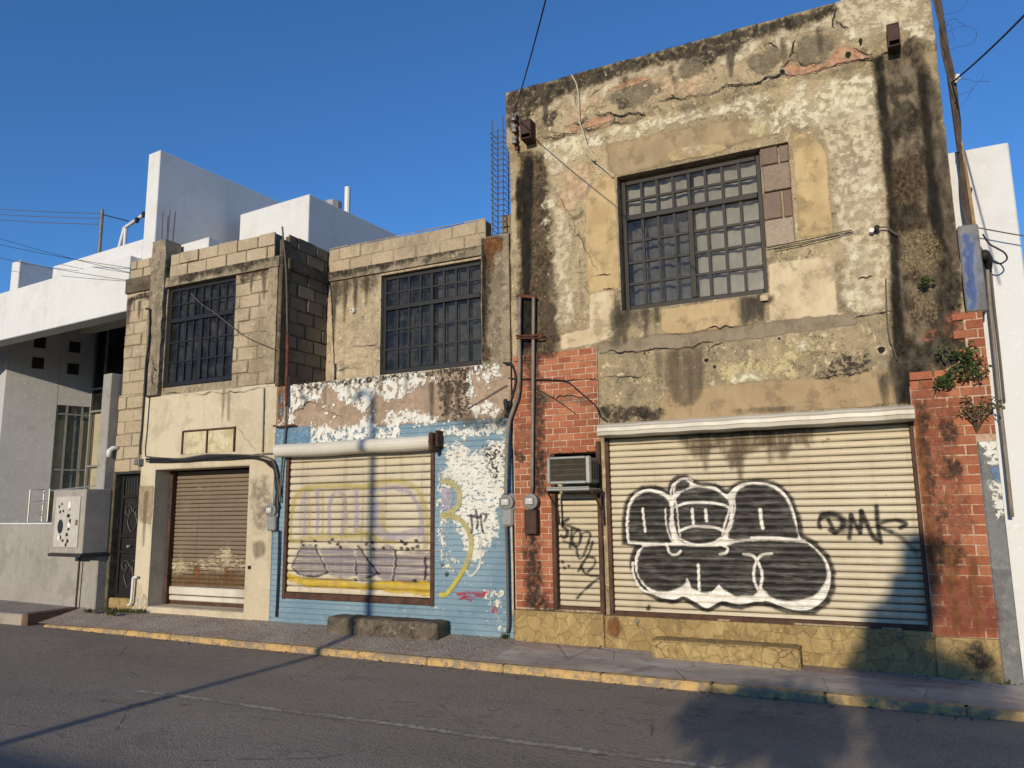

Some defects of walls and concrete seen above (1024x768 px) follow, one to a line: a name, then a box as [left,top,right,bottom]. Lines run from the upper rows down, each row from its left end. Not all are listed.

crack [509,4,888,148]
peeling [717,0,935,82]
water stain [514,35,966,496]
water stain [292,236,508,427]
crack [522,325,743,400]
peeling [276,363,538,572]
peeling [979,441,1004,520]
corrosion [171,566,245,587]
peeling [483,584,506,632]